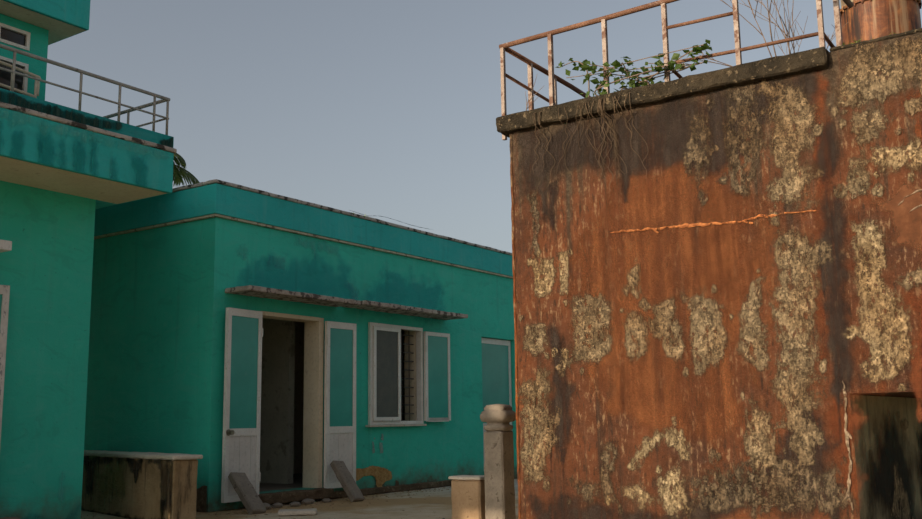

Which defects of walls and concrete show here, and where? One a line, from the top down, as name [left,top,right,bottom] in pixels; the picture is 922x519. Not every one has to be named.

peeling [830,36,922,199]
crack [607,210,816,234]
peeling [517,79,858,519]
peeling [842,219,922,391]
spalling [356,466,399,487]
corrosion [827,394,861,506]
peeling [890,459,914,519]